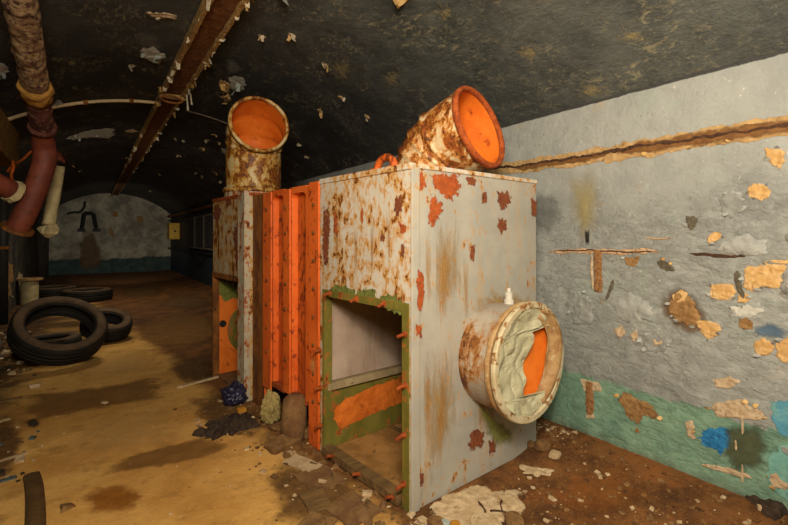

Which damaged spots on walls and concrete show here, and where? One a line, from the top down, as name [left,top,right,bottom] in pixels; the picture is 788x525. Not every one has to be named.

peeling [145,12,177,20]
peeling [137,33,166,64]
peeling [66,107,179,173]
spalling [480,115,788,174]
spalling [745,183,771,201]
spalling [664,290,721,341]
spalling [706,260,787,330]
spalling [753,338,788,363]
spalling [613,392,663,424]
peeling [712,376,740,389]
spalling [685,398,788,501]
water stain [726,416,766,483]